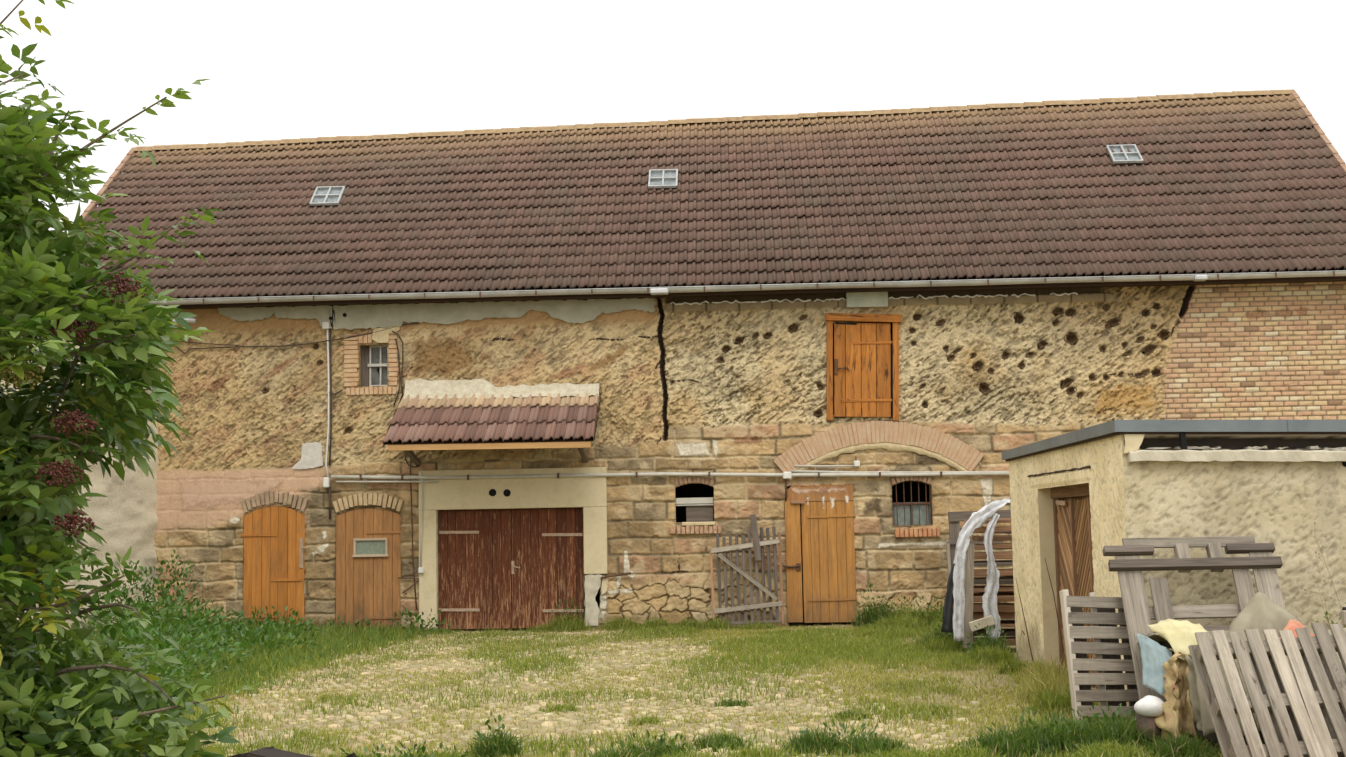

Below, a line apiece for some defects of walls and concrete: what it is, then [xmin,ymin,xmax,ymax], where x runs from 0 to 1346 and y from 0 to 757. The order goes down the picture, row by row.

spalling [889,292,1079,346]
crack [1171,286,1194,335]
crack [590,298,702,444]
spalling [944,340,1049,394]
spalling [1061,303,1172,399]